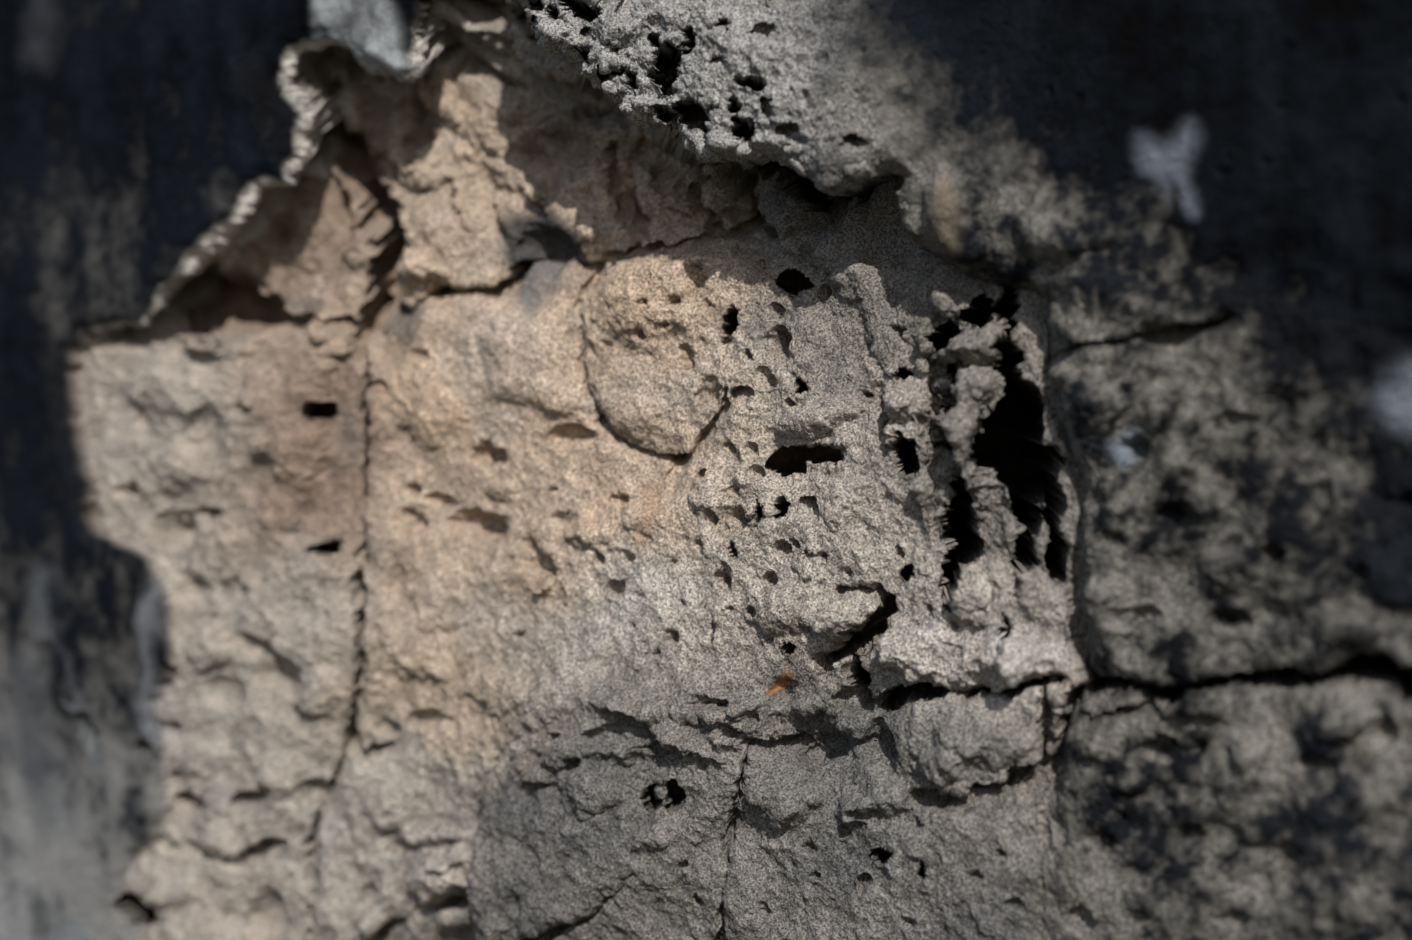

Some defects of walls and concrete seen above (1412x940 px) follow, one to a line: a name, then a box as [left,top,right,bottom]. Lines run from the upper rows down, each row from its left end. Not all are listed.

crack [39,50,769,546]
spalling [64,0,1089,940]
crack [344,722,397,763]
crack [370,886,469,940]
crack [711,732,818,940]
crack [811,583,1412,940]